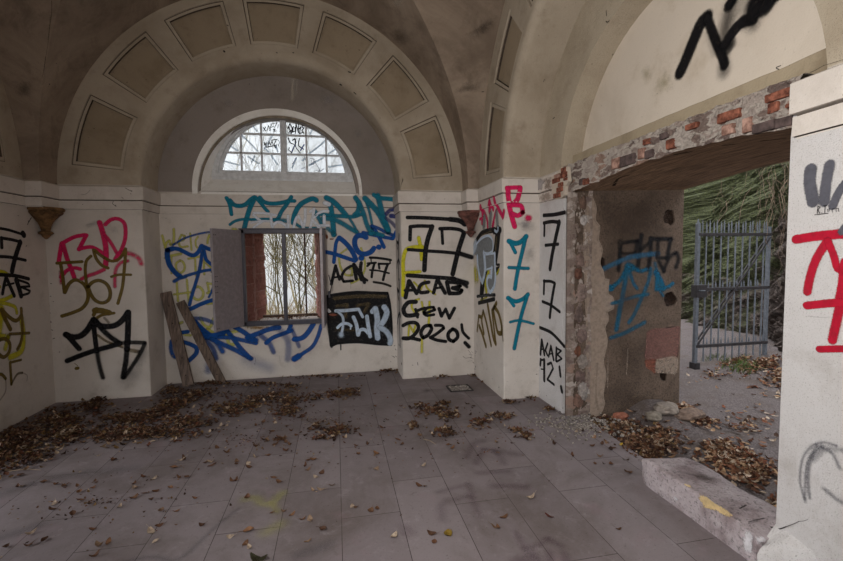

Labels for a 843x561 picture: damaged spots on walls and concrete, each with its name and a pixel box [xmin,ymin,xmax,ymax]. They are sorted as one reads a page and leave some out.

spalling [538,167,614,418]
spalling [645,326,680,381]